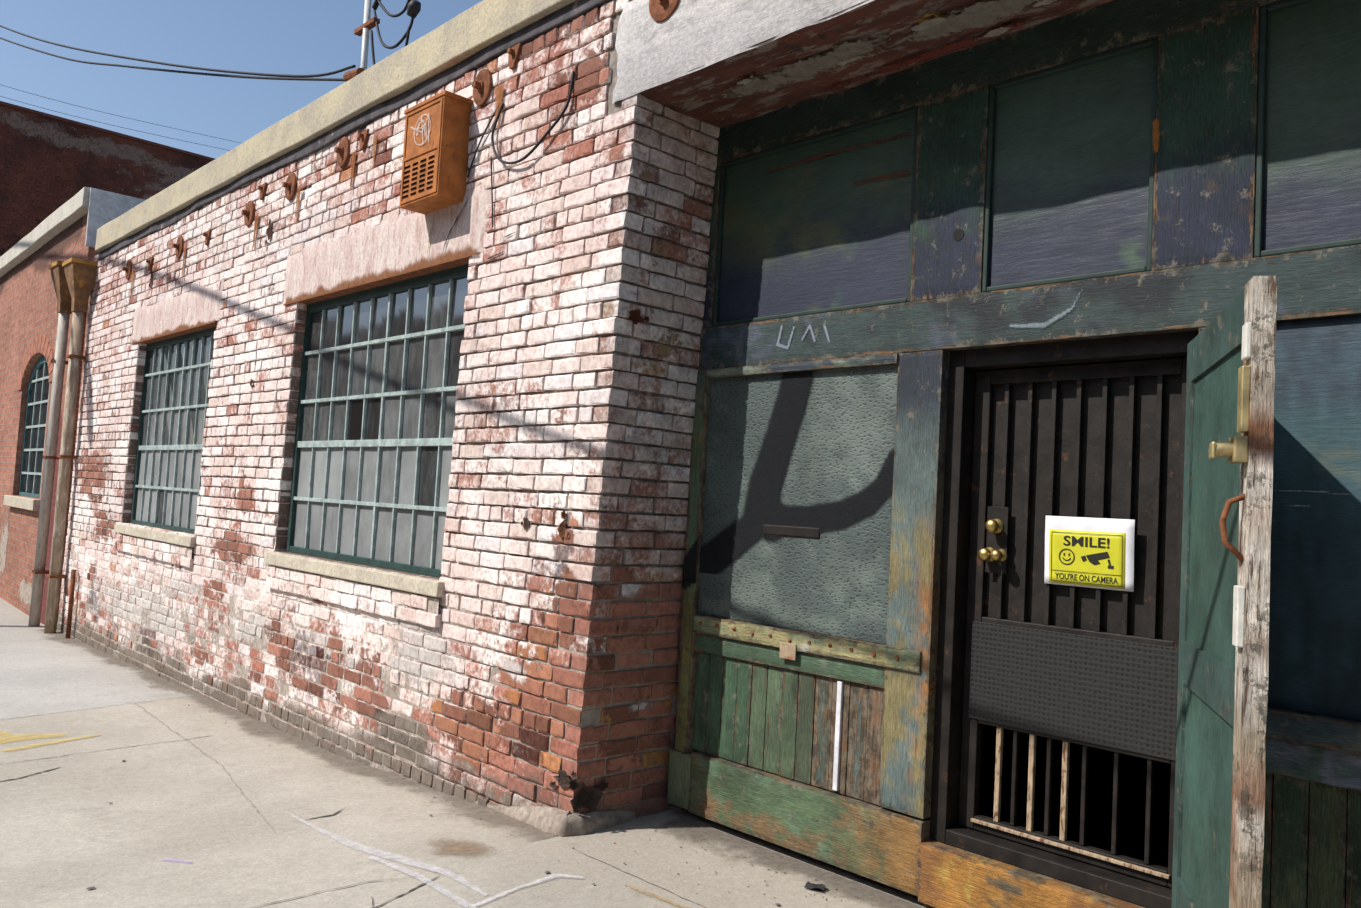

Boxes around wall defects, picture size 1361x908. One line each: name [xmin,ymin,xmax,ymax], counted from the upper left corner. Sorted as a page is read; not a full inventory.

peeling [711,0,1057,98]
peeling [77,447,115,541]
peeling [237,474,255,515]
peeling [211,529,255,569]
peeling [203,579,227,608]
peeling [190,642,209,666]
peeling [264,618,294,661]
peeling [292,613,396,738]
peeling [430,563,680,812]